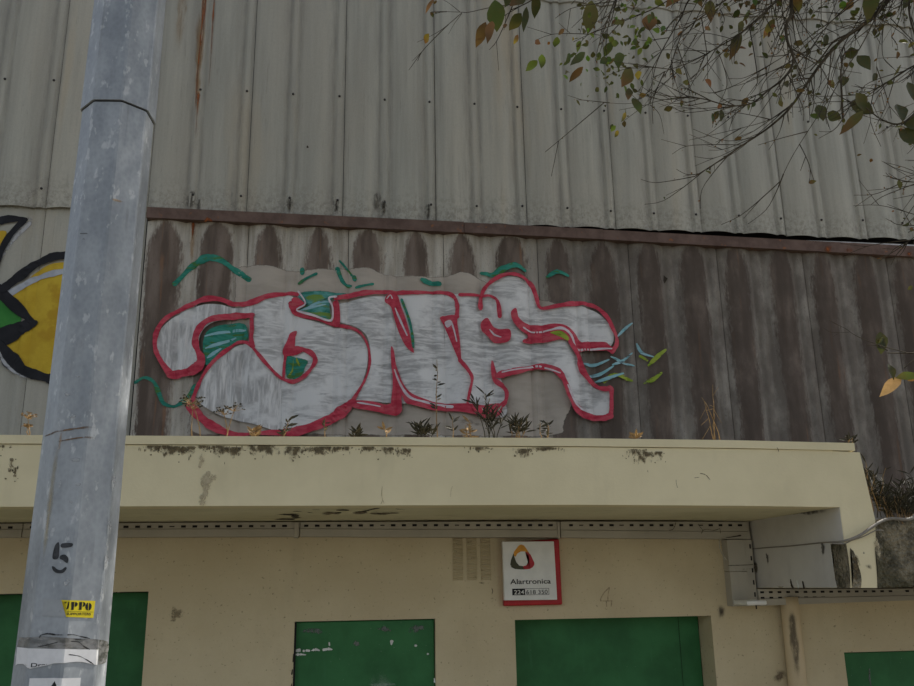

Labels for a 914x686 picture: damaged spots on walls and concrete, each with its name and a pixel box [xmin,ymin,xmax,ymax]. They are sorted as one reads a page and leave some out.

rust [196,0,215,110]
damp [514,447,563,458]